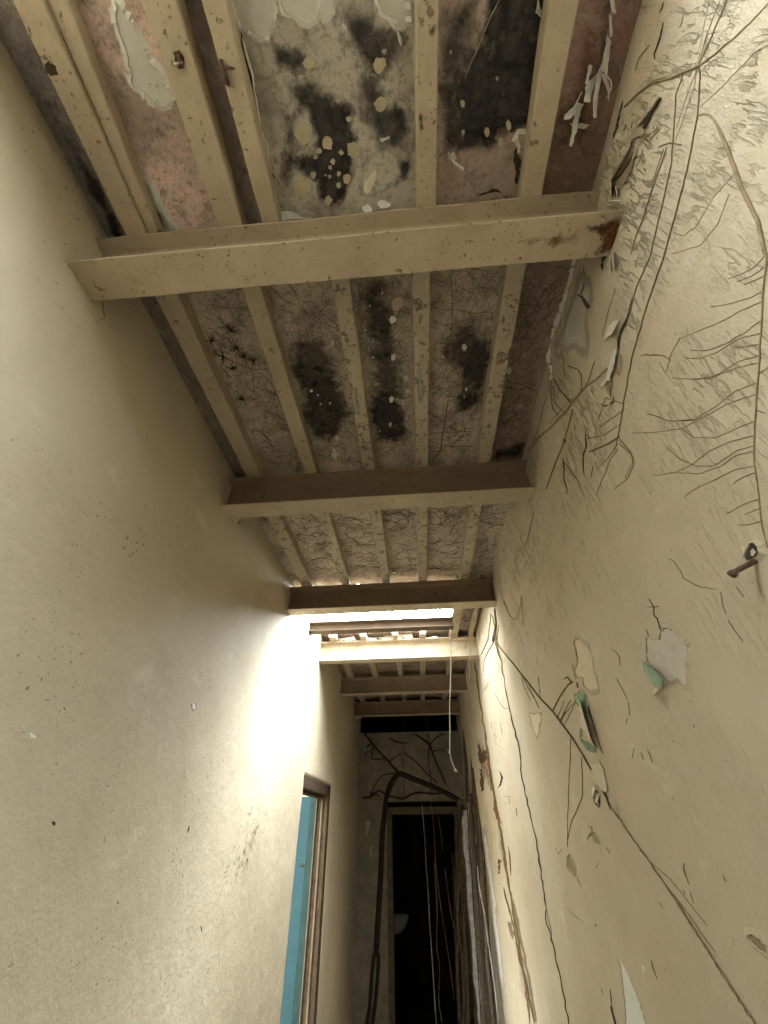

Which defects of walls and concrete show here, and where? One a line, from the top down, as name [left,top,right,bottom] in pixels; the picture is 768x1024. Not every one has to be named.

peeling [108,0,175,112]
peeling [232,0,347,43]
water stain [275,18,406,207]
water stain [442,0,543,171]
peeling [563,0,616,147]
crack [635,3,684,71]
rust [589,219,620,255]
water stain [363,282,406,442]
water stain [442,319,490,411]
crack [563,434,594,494]
flaking render [642,600,693,695]
crack [474,643,569,1024]